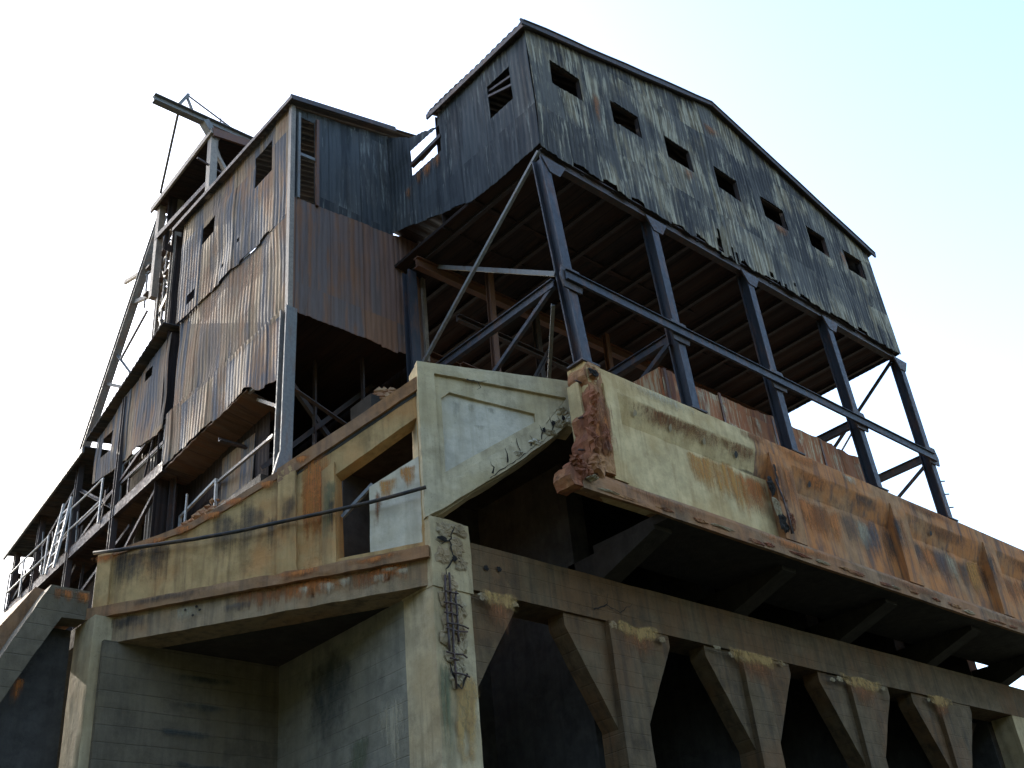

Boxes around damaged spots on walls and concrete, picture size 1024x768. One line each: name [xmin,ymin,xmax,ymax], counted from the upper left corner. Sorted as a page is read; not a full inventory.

crack [490,415,559,478]
spalling [569,366,639,503]
rust [296,455,327,528]
rust [907,501,991,588]
spalling [435,521,471,689]
peeling [477,590,519,622]
peeling [609,620,666,651]
peeling [713,645,785,680]
peeling [830,674,885,703]